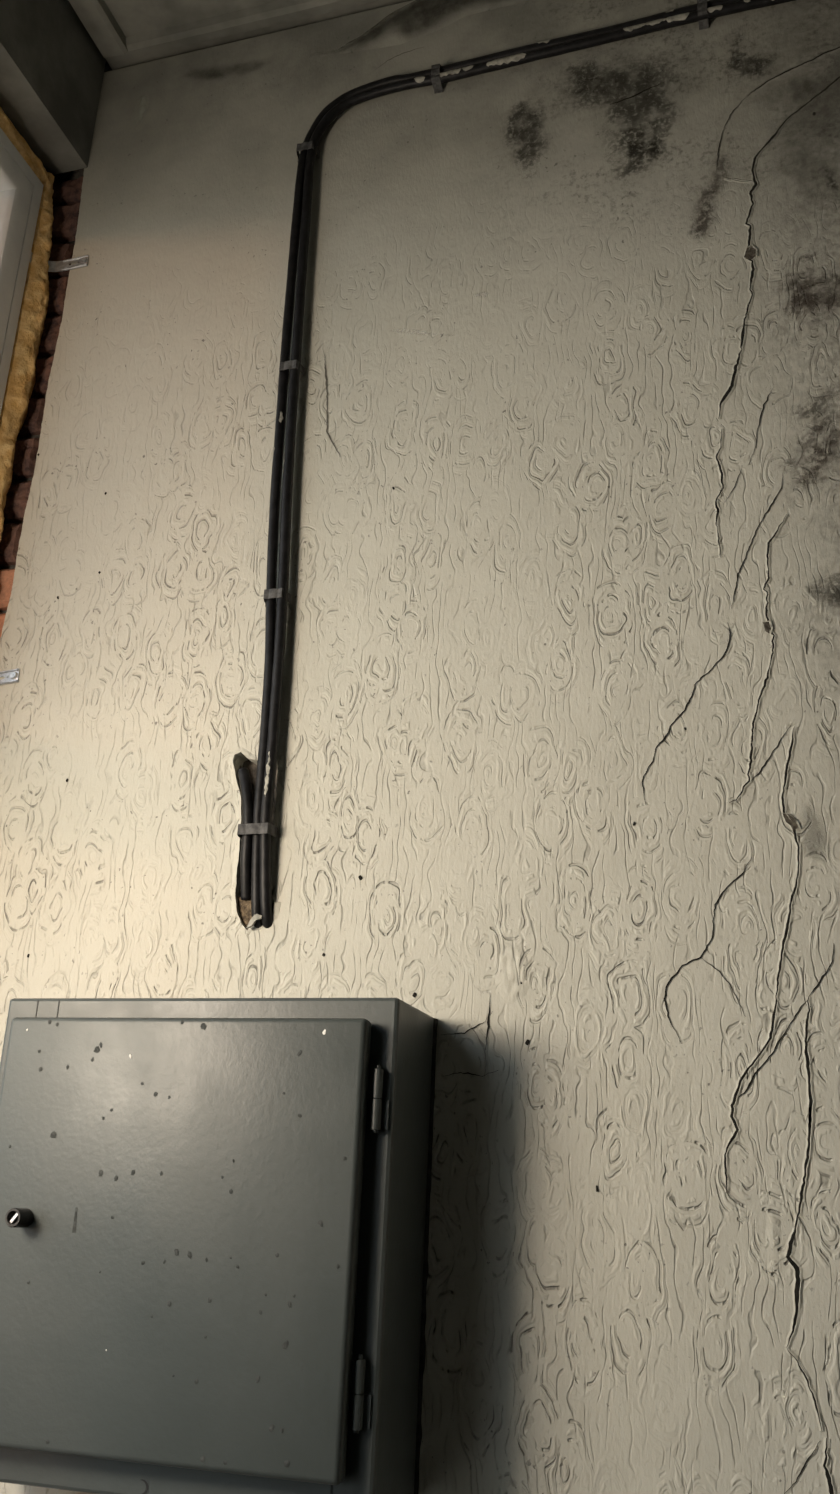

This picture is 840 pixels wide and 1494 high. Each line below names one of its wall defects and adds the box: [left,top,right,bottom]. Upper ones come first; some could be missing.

leakage [508,104,543,161]
leakage [572,65,670,156]
leakage [694,167,722,235]
leakage [789,275,840,310]
leakage [804,426,837,483]
crack [642,46,840,1494]